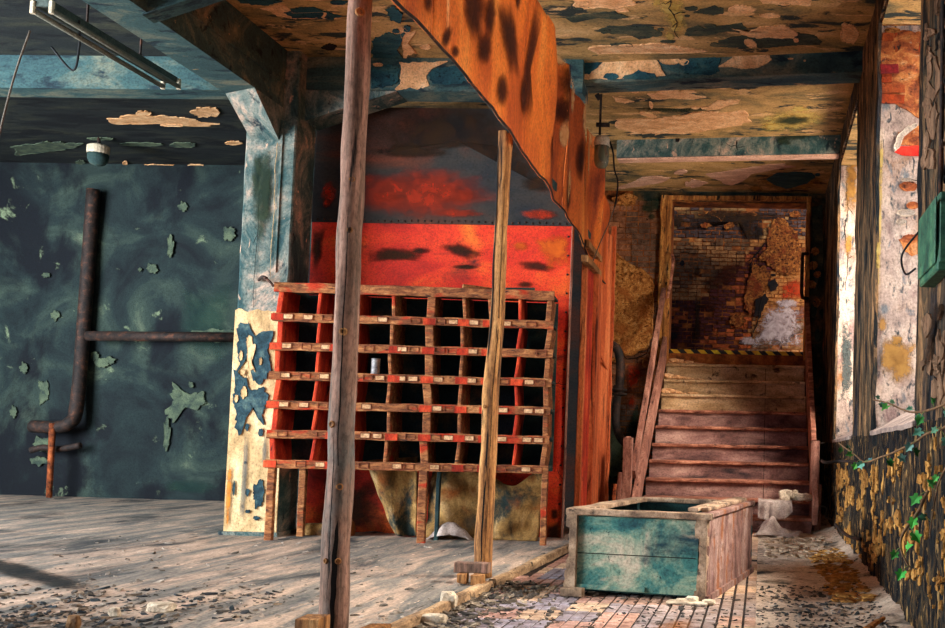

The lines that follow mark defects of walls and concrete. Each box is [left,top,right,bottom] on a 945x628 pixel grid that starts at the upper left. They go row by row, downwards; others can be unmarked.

peeling [106,107,220,127]
peeling [370,6,468,91]
peeling [612,90,752,142]
peeling [566,0,822,80]
flaking render [880,0,945,170]
corrosion [365,175,473,216]
flaking render [896,178,918,256]
water stain [743,280,800,344]
peeling [163,382,207,452]
peeling [191,322,274,436]
peeling [919,304,945,409]
peeling [232,479,265,520]